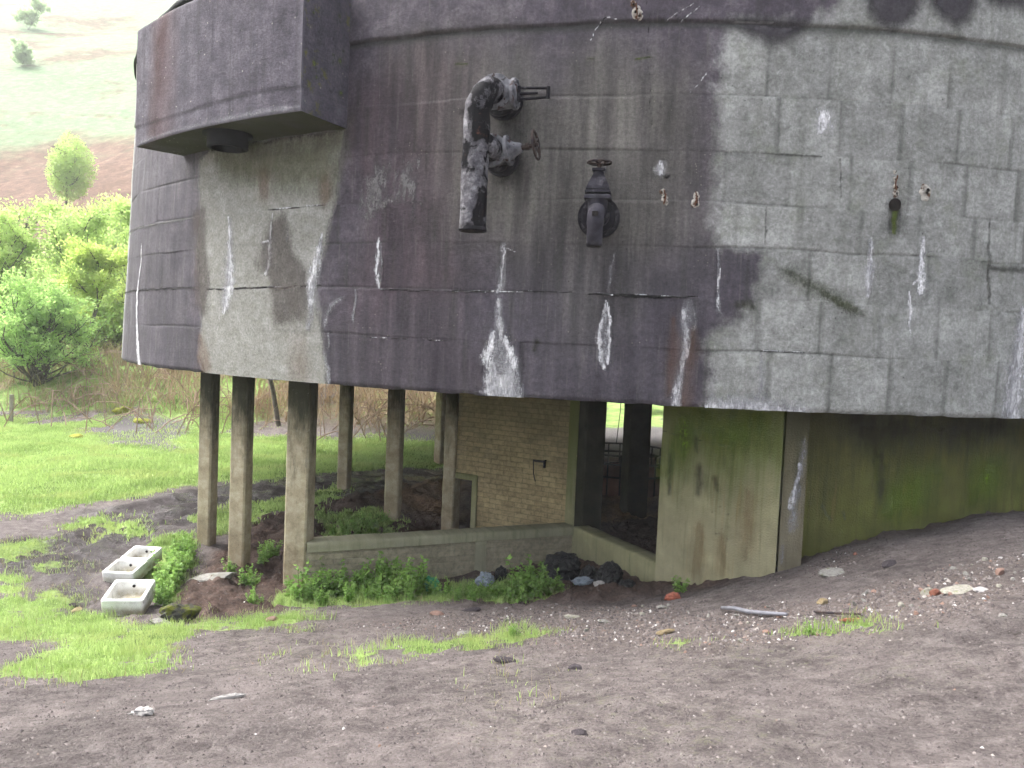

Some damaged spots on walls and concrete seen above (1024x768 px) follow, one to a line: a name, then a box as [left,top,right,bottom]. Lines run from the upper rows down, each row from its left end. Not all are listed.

damp [868,0,1024,28]
crack [269,203,323,211]
spalling [657,162,670,206]
crack [124,284,321,294]
damp [194,129,345,384]
damp [482,244,522,398]
damp [597,303,612,369]
damp [671,307,696,406]
damp [788,451,806,525]